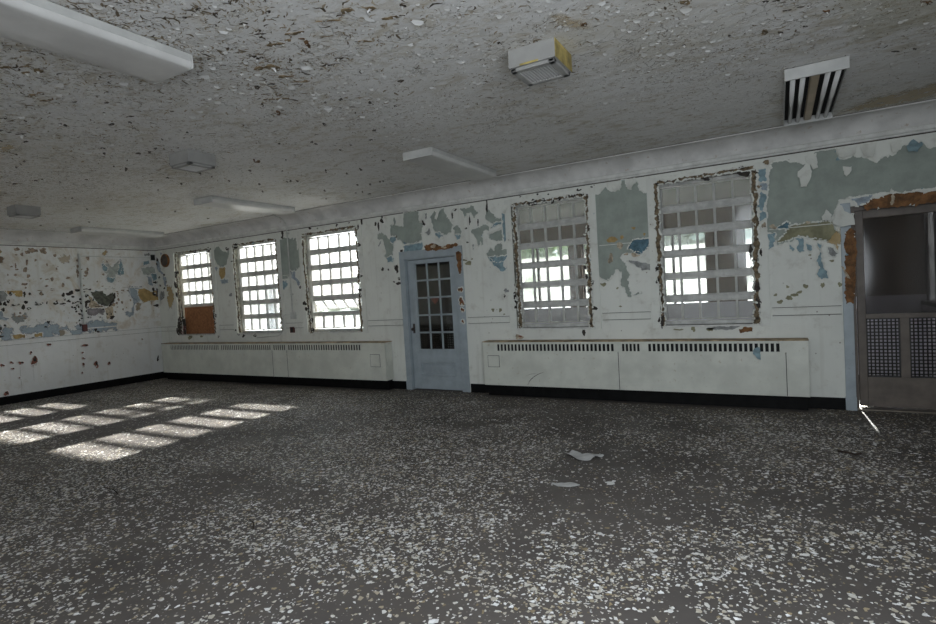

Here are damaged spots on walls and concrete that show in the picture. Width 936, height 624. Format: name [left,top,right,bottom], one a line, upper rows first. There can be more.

flaking render [0,0,936,230]
spalling [0,350,39,380]
peeling [0,219,364,375]
peeling [374,139,936,336]